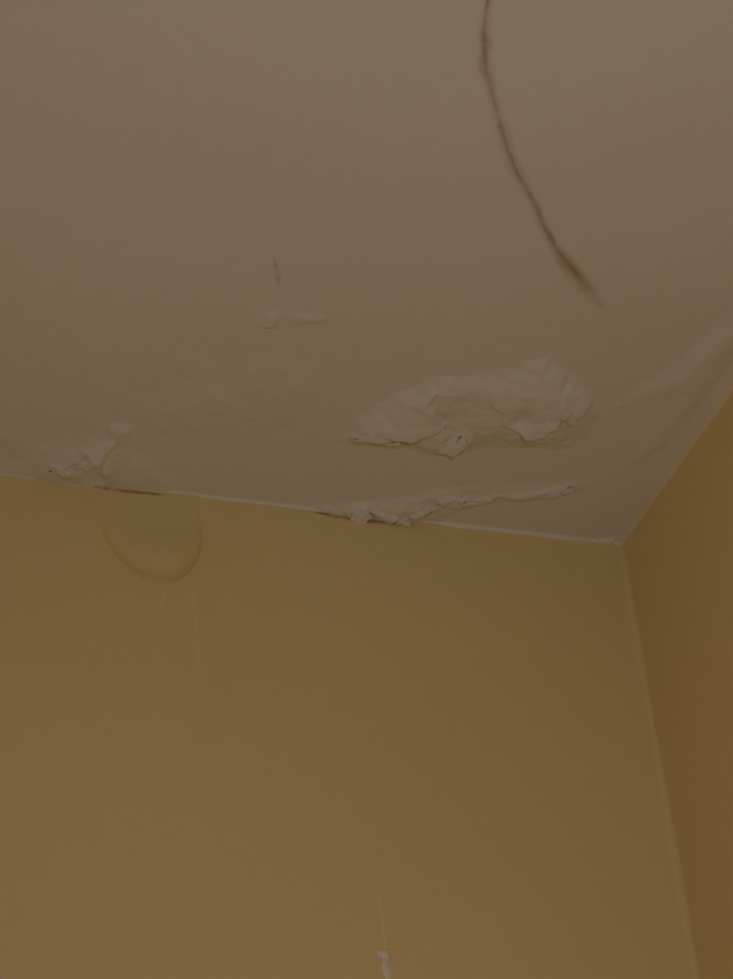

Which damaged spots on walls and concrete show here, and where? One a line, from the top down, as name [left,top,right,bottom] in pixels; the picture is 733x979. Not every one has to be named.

crack [375,879,391,979]